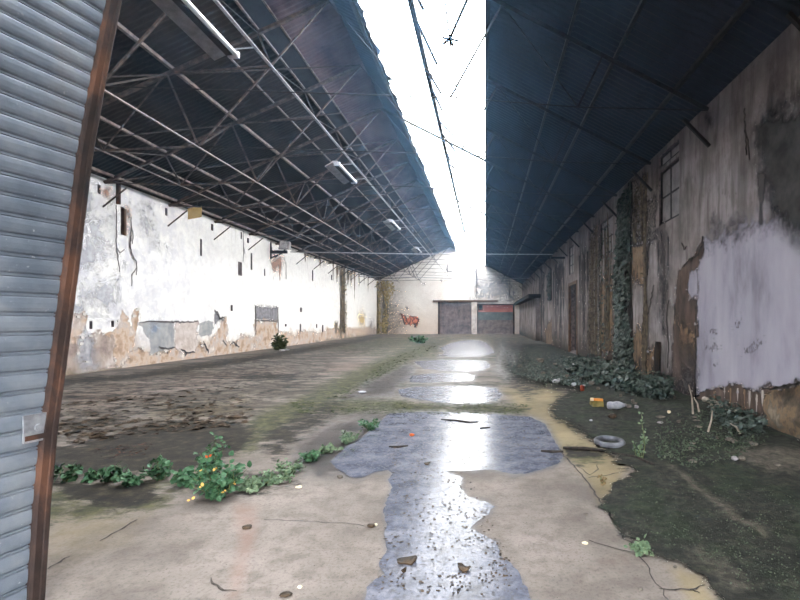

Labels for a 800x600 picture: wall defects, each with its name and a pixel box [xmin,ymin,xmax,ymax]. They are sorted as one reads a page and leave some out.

leakage [753,91,800,242]
crack [115,205,137,286]
spalling [66,305,257,371]
peeling [671,209,800,417]
crack [559,448,703,600]